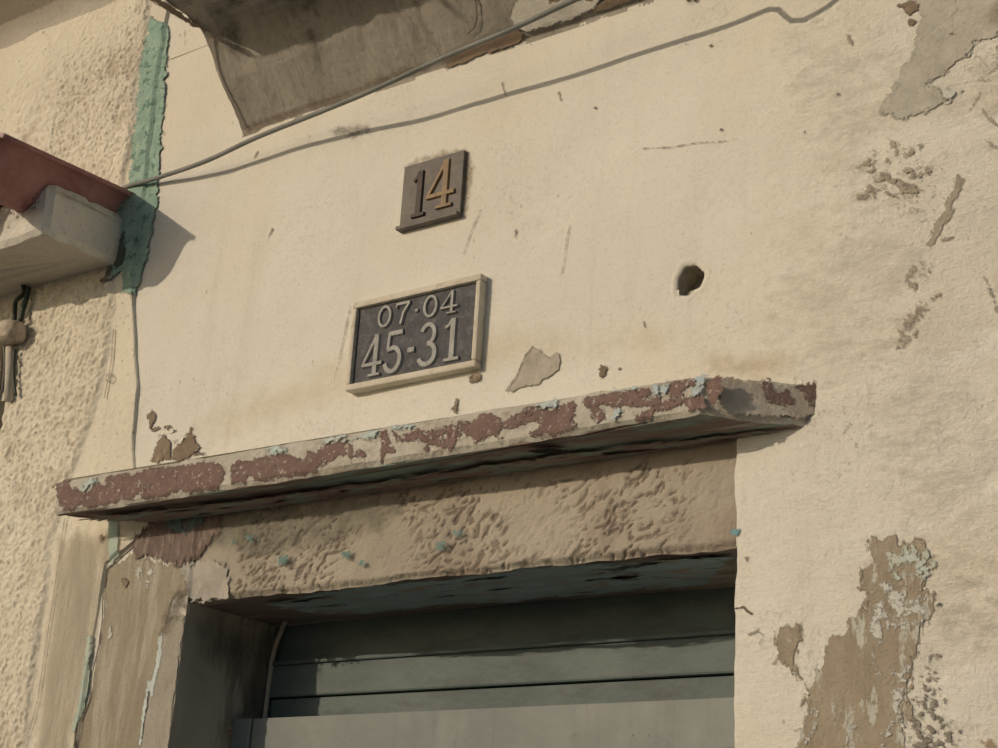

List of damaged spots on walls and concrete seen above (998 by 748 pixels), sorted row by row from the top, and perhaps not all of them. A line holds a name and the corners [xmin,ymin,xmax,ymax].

peeling [444,0,600,69]
peeling [878,0,998,120]
spalling [853,138,931,203]
spalling [926,174,965,247]
spalling [895,261,941,352]
spalling [505,346,560,393]
peeling [52,374,817,748]
peeling [773,533,962,748]